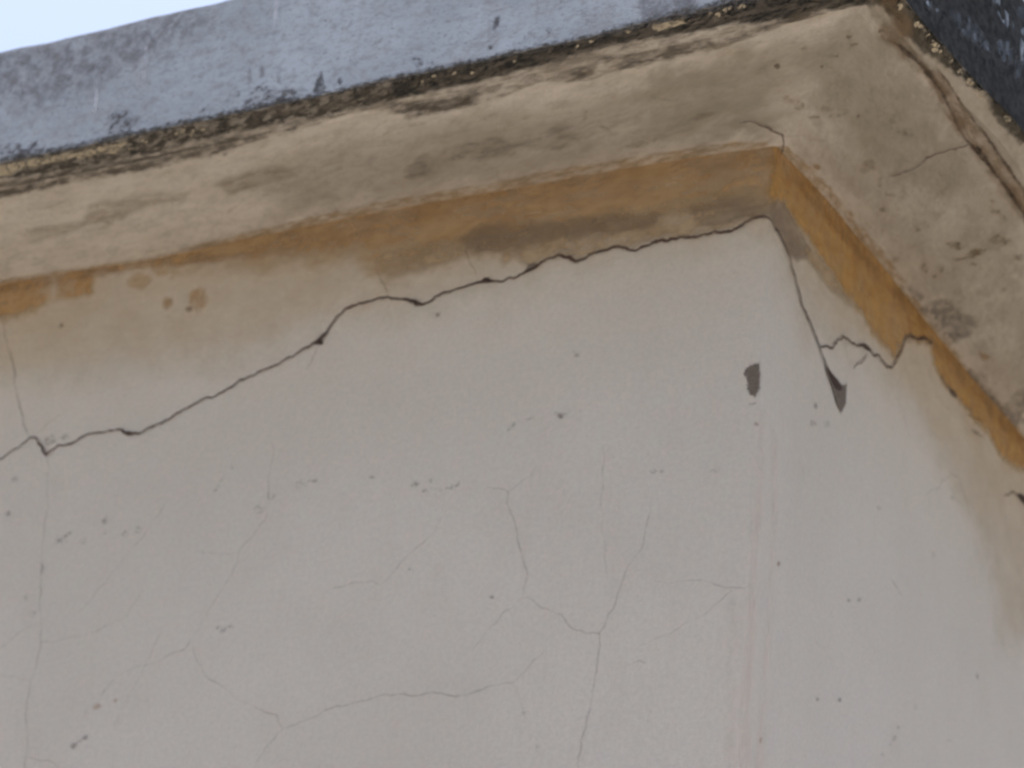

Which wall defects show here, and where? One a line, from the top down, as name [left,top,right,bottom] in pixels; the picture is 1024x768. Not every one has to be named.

water stain [0,0,1024,196]
water stain [0,277,47,316]
crack [0,215,933,459]
water stain [172,146,1024,468]
peeling [744,363,760,398]